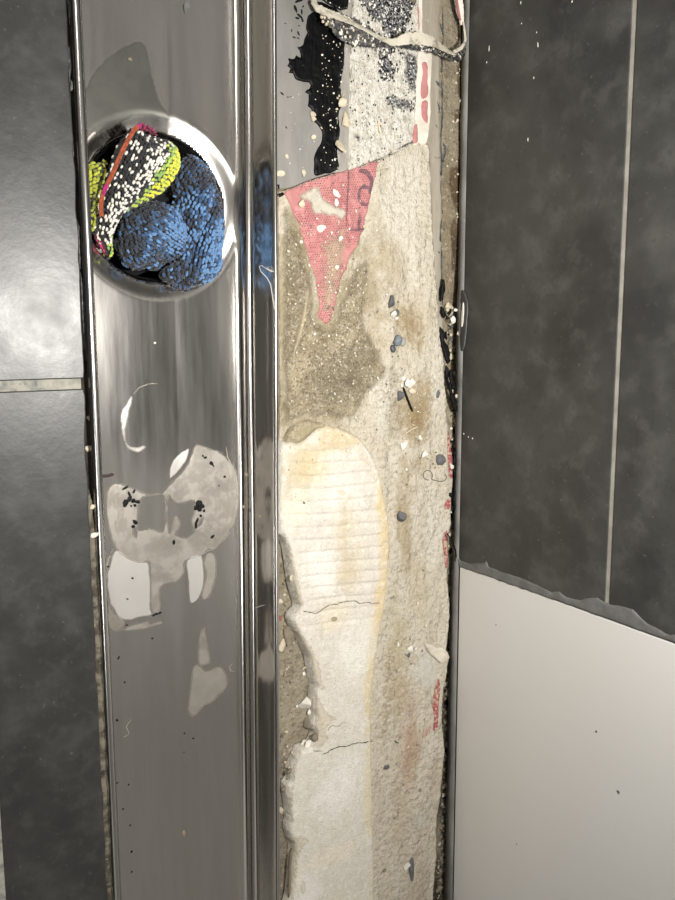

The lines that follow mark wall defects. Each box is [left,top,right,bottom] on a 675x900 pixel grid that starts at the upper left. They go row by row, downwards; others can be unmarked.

peeling [285,0,467,63]
peeling [338,97,350,127]
water stain [200,448,237,599]
crack [304,600,379,614]
water stain [189,664,235,715]
crack [314,722,372,755]